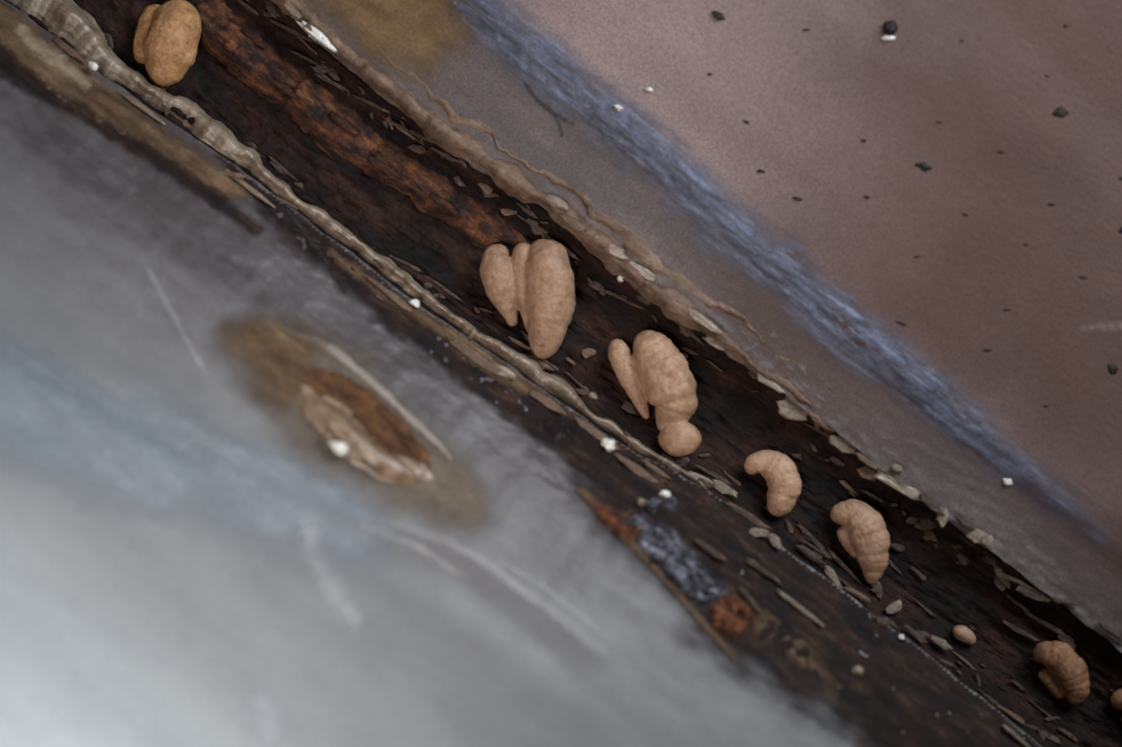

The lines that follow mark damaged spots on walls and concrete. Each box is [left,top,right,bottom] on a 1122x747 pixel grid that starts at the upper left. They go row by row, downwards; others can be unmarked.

corrosion [0,0,587,468]
water stain [454,1,992,458]
peeling [6,0,994,550]
corrosion [227,321,487,525]
peeling [695,538,728,561]
peeling [745,557,825,627]
corrosion [543,424,1039,747]
peeling [796,544,872,603]
peeling [875,599,953,650]
peeling [994,567,1081,606]
peeling [1002,725,1030,747]